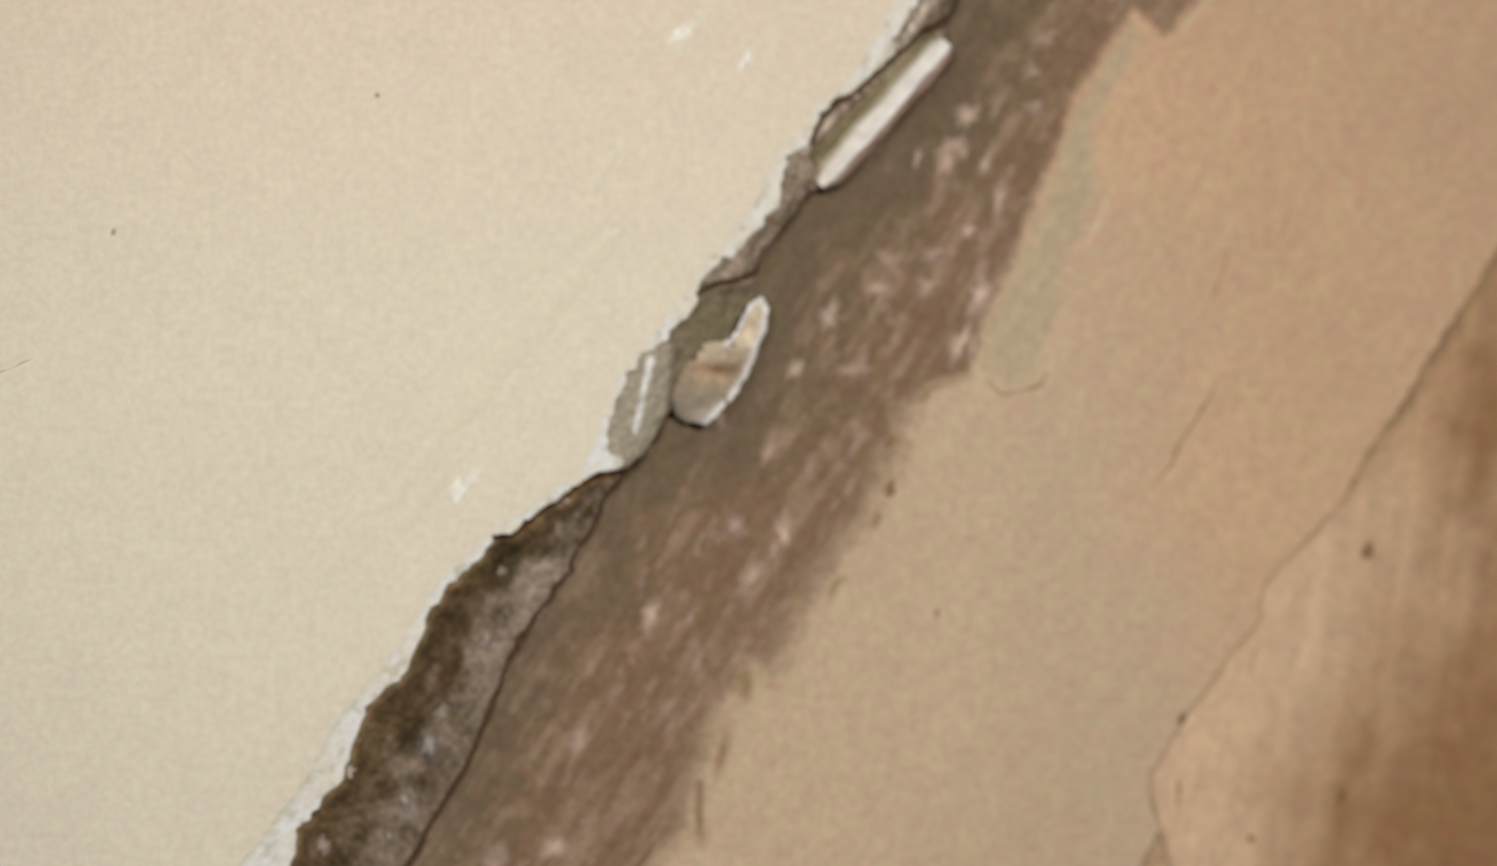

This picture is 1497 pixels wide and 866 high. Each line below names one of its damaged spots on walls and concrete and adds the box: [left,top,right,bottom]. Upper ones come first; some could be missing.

crack [404,411,675,866]
flaking render [235,0,1199,866]
crack [696,191,813,294]
crack [811,0,958,146]
flaking render [1142,250,1497,866]